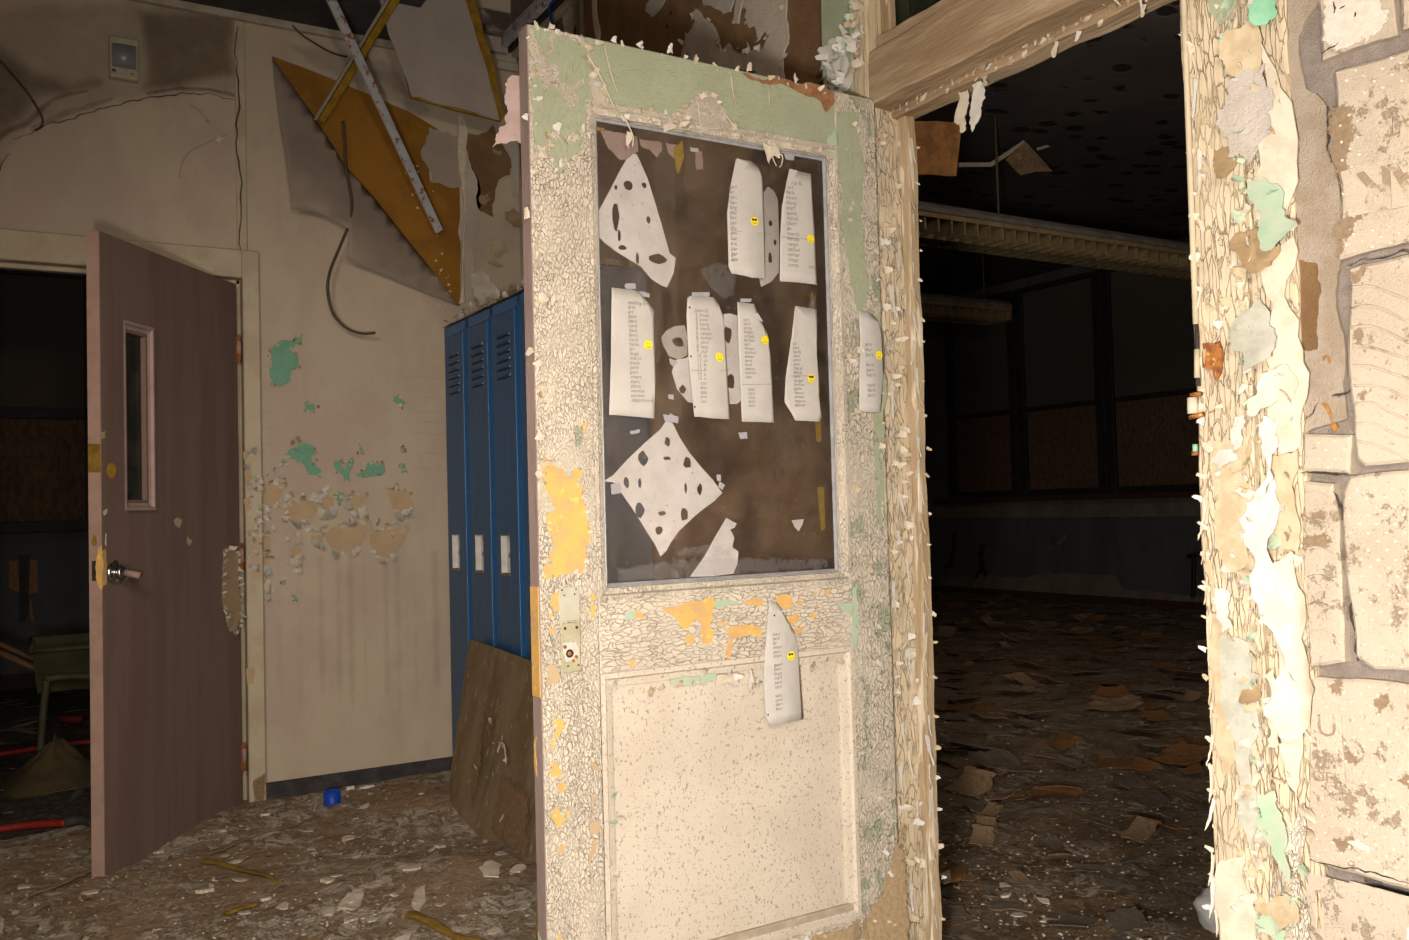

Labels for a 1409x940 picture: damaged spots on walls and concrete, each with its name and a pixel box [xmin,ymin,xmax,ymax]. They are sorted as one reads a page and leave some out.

flaking render [645,0,865,112]
crack [0,92,234,171]
peeling [444,0,823,323]
peeling [267,334,303,386]
peeling [525,347,547,398]
flaking render [792,0,1389,940]
peeling [222,436,414,636]
peeling [535,430,592,636]
peeling [661,597,762,689]
peeling [746,594,817,634]